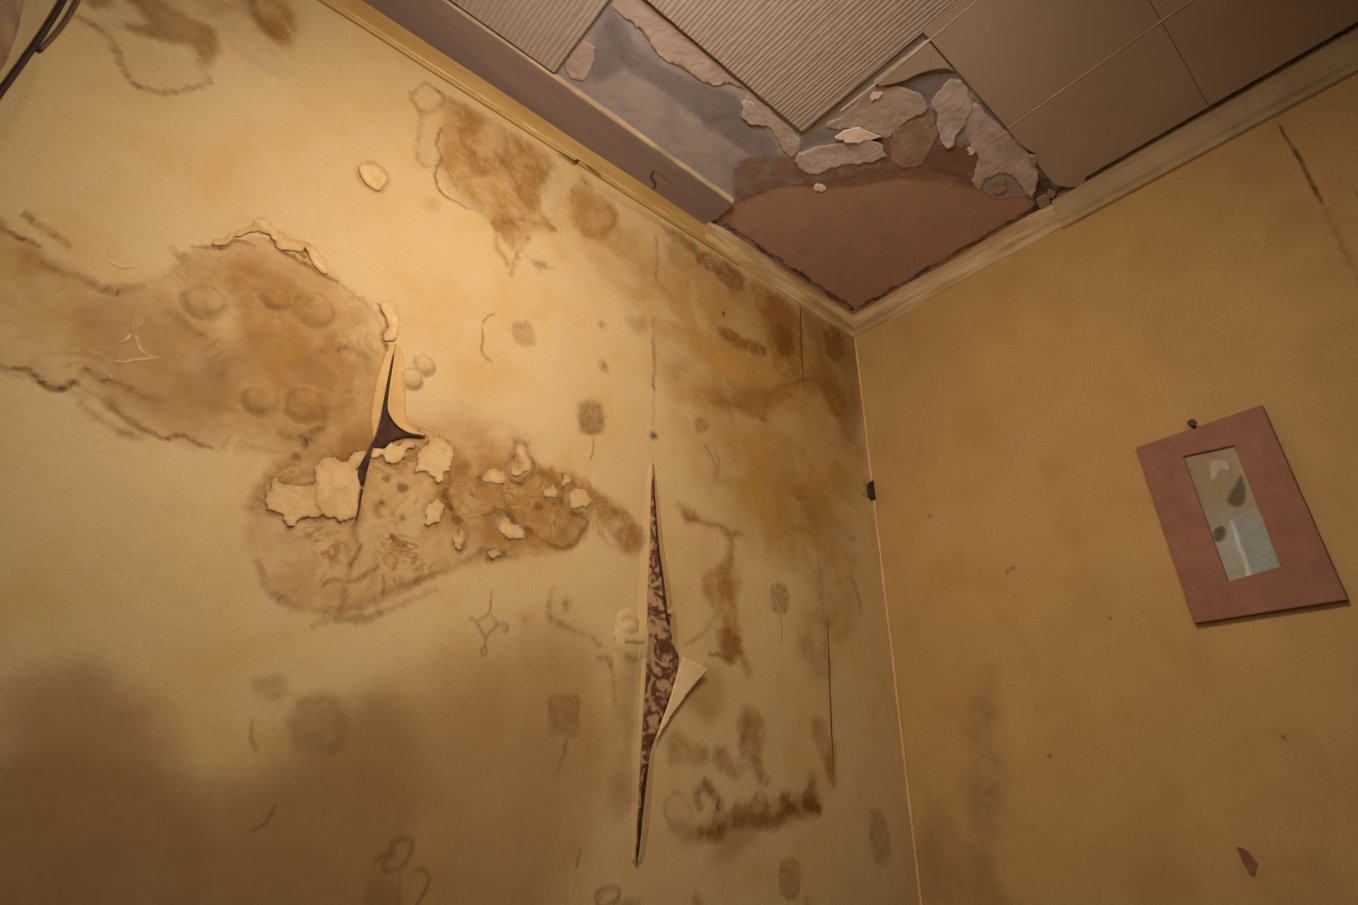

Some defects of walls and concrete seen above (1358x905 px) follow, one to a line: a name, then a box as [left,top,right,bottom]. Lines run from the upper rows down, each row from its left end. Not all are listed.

peeling [566,40,595,81]
flaking render [612,0,1038,314]
water stain [23,367,75,390]
water stain [655,283,854,538]
peeling [265,437,454,527]
water stain [365,428,450,473]
peeling [482,445,531,484]
water stain [442,459,605,557]
peeling [543,475,592,509]
water stain [303,520,431,593]
peeling [488,517,525,559]